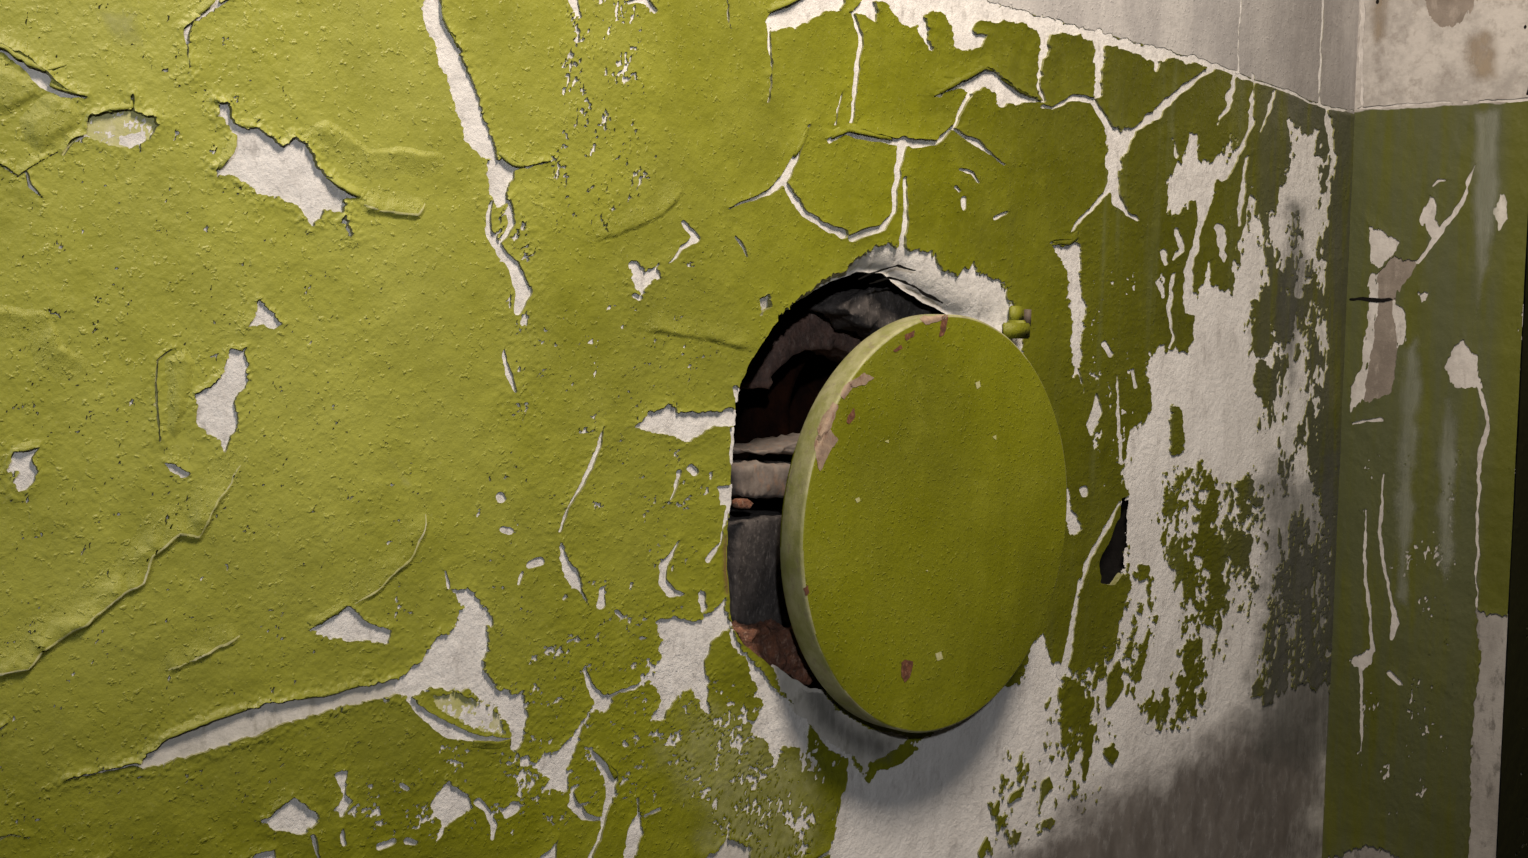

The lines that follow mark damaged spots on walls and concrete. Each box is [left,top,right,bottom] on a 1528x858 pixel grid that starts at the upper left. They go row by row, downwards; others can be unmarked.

peeling [216,103,364,233]
crack [729,4,1242,306]
crack [1237,87,1275,226]
peeling [1493,194,1508,231]
peeling [248,299,281,329]
peeling [1350,166,1475,424]
peeling [195,348,248,451]
peeling [390,118,1402,858]
peeling [307,599,390,644]
peeling [376,837,417,850]